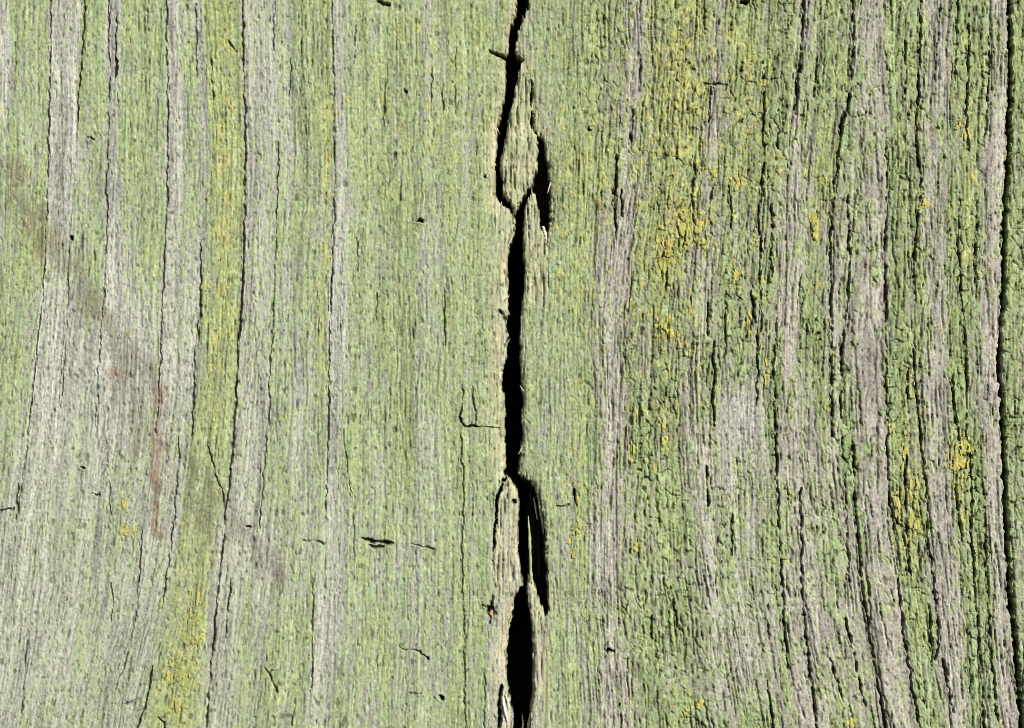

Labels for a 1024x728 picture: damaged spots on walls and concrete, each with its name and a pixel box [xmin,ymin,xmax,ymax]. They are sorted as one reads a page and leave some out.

crack [457,0,577,728]